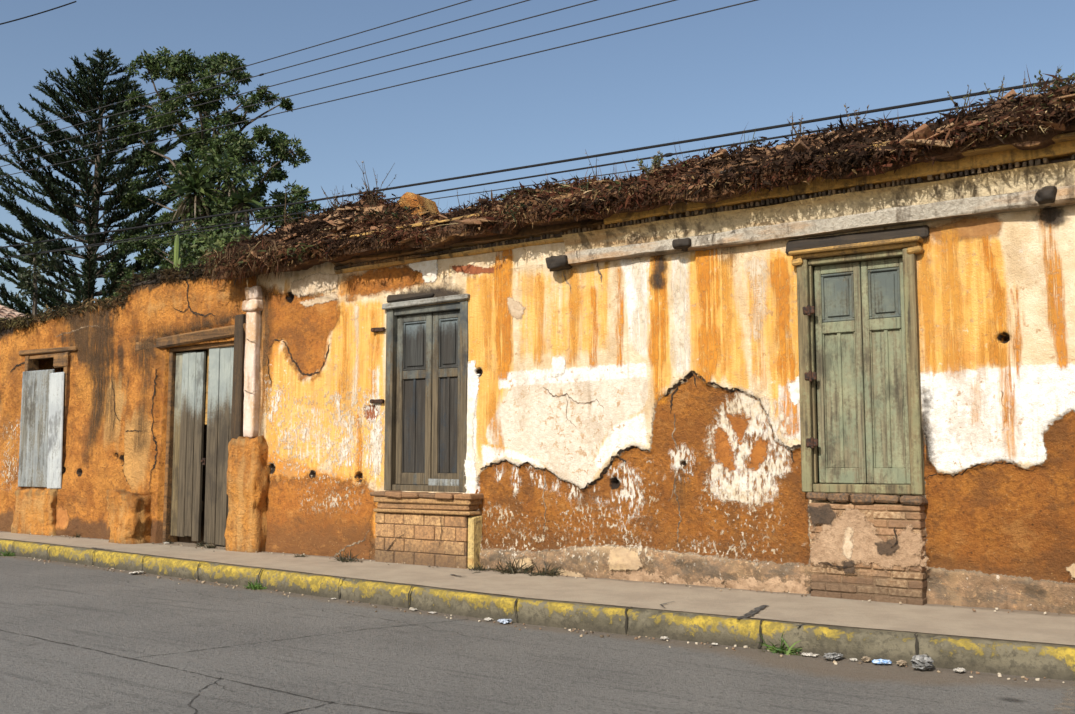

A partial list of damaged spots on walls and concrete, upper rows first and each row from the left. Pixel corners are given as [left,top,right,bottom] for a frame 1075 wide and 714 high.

leakage [929,216,1002,243]
leakage [1039,207,1064,226]
crack [174,282,217,317]
spalling [264,260,502,381]
leakage [632,255,689,372]
leakage [64,305,117,459]
leakage [135,329,175,448]
spalling [264,374,385,560]
crack [480,446,649,533]
crack [543,387,604,427]
crack [664,370,801,549]
spalling [464,360,1075,585]